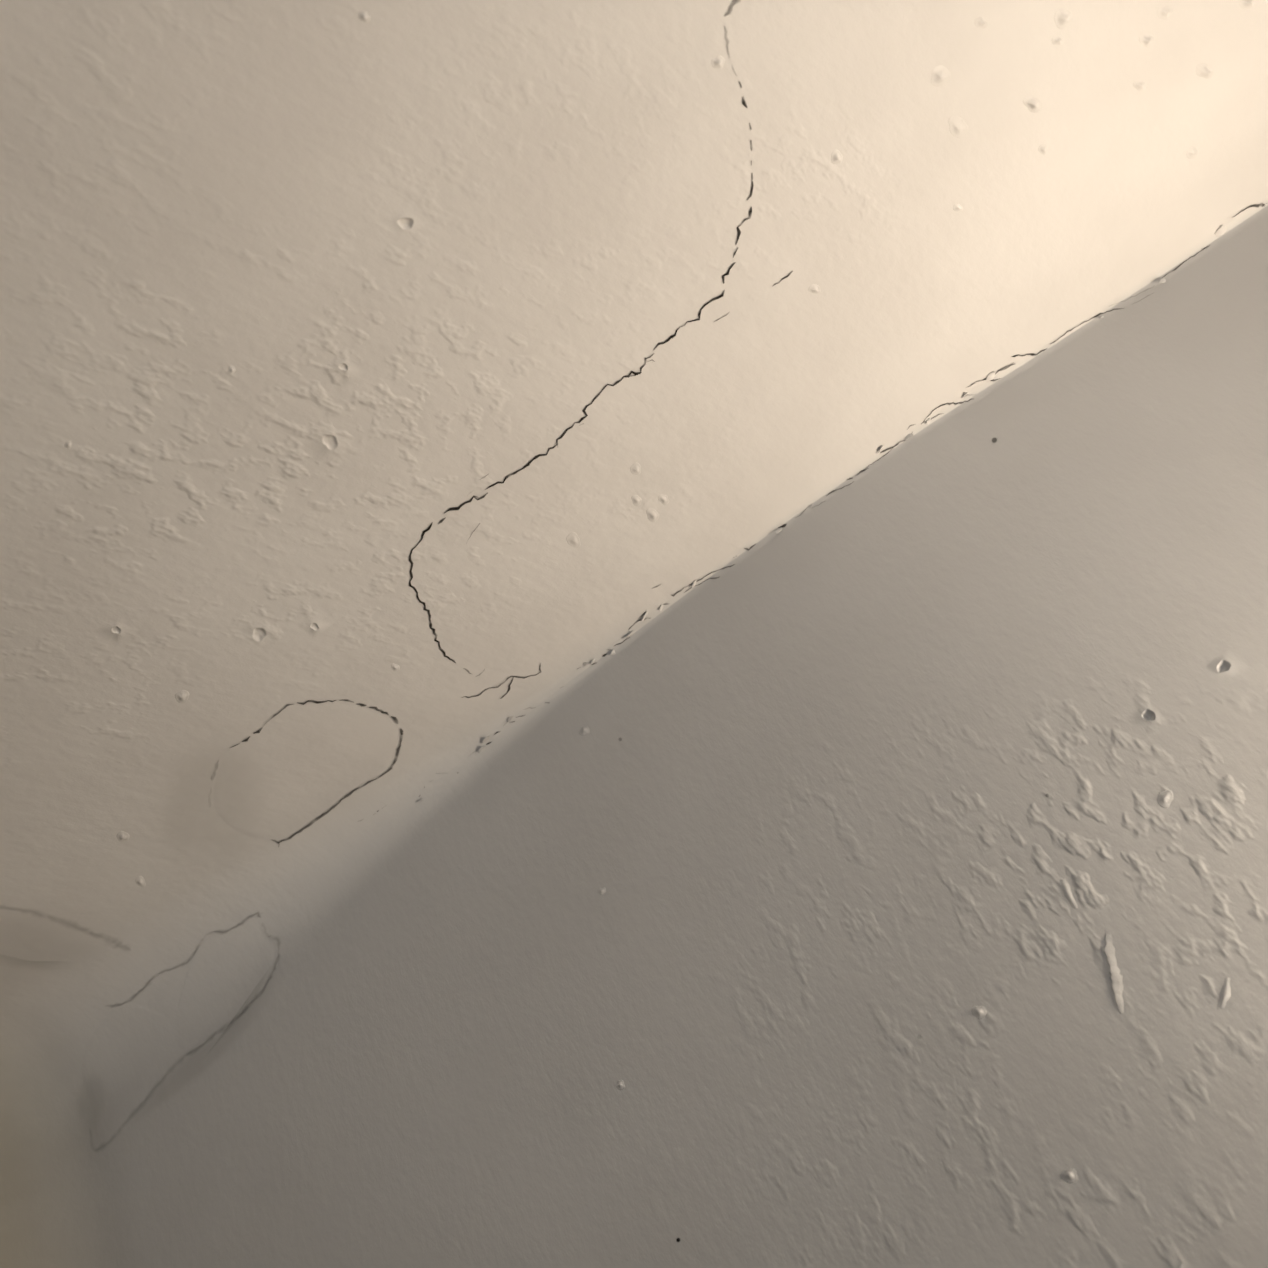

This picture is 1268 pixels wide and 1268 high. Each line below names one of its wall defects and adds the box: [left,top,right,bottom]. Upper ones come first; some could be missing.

crack [409,81,754,753]